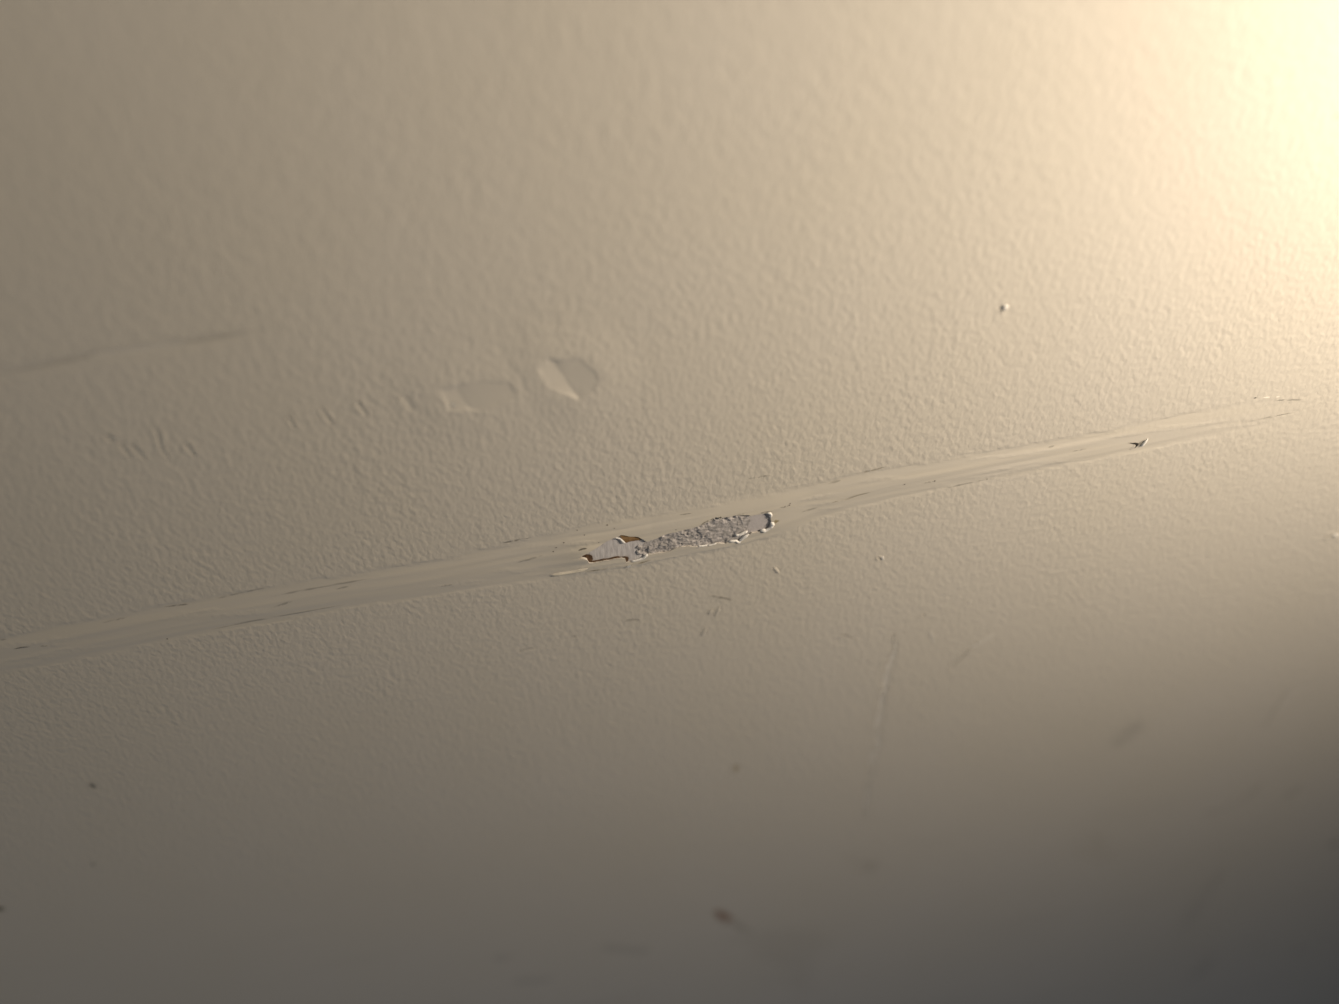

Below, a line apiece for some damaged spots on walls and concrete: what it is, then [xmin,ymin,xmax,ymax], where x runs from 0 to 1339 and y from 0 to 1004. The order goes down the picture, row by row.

peeling [579,512,780,568]